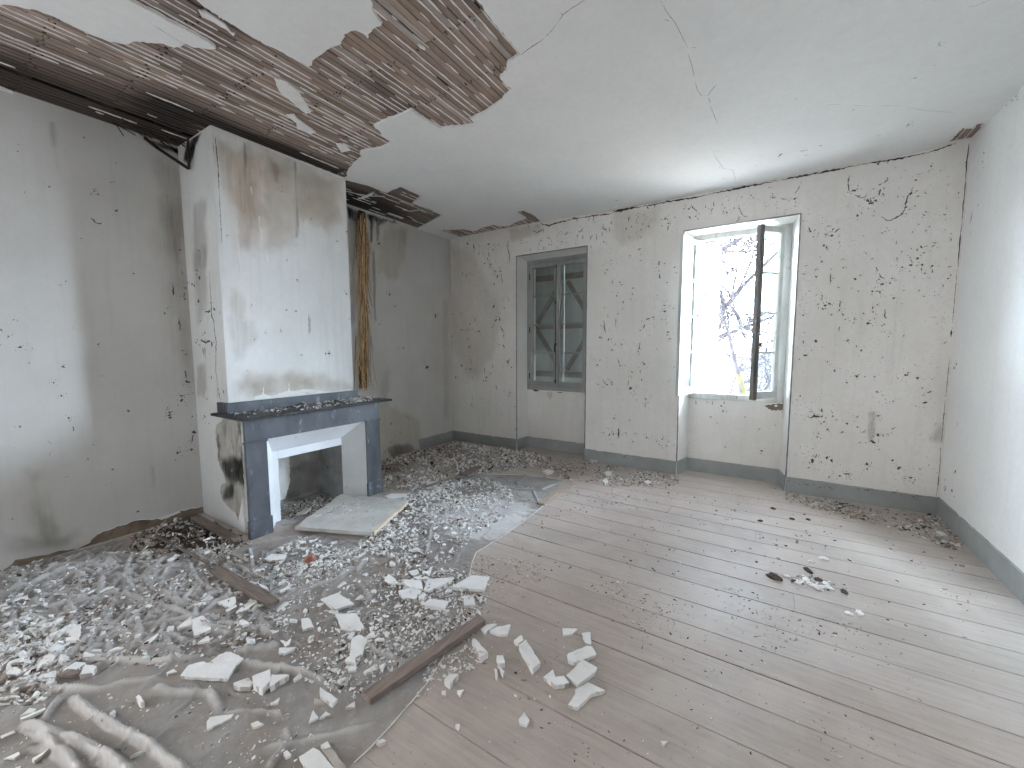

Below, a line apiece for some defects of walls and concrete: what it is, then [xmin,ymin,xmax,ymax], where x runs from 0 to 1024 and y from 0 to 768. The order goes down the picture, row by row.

flaking render [0,0,540,284]
leakage [224,462,241,498]